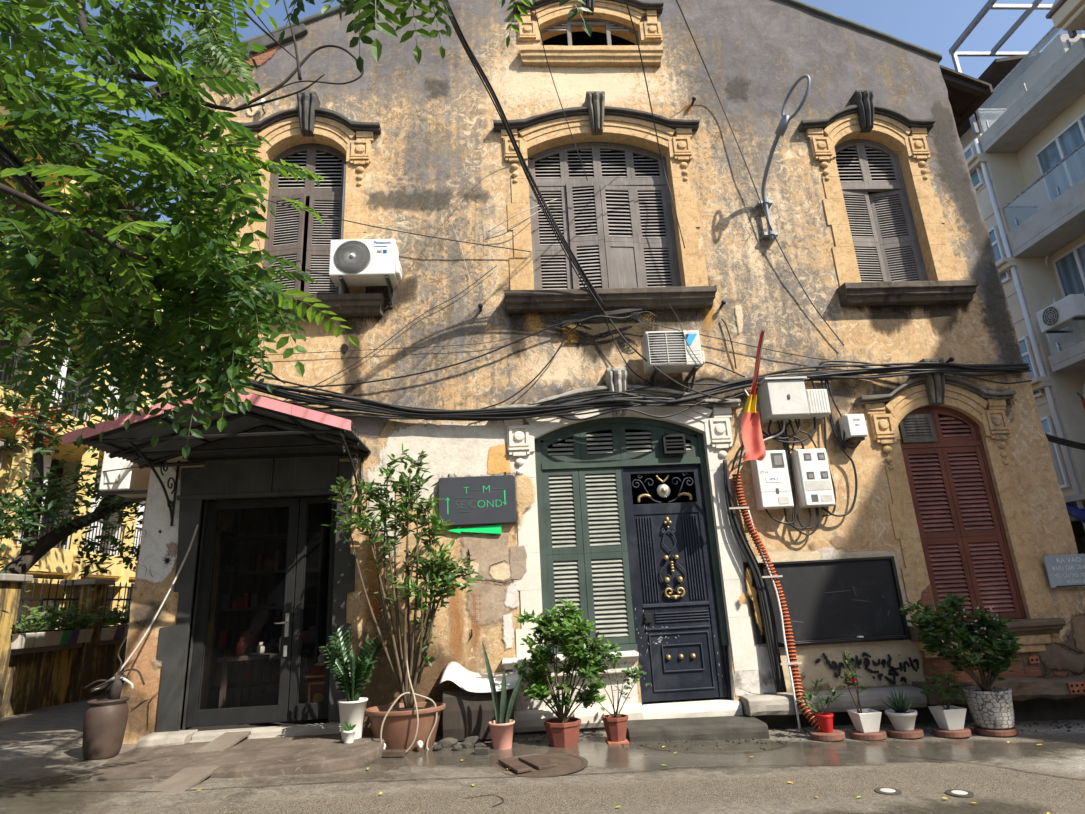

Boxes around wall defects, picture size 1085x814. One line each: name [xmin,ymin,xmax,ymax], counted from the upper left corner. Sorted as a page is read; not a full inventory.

water stain [501,287,706,361]
peeling [137,466,181,583]
peeling [363,420,536,649]
peeling [732,536,1085,697]